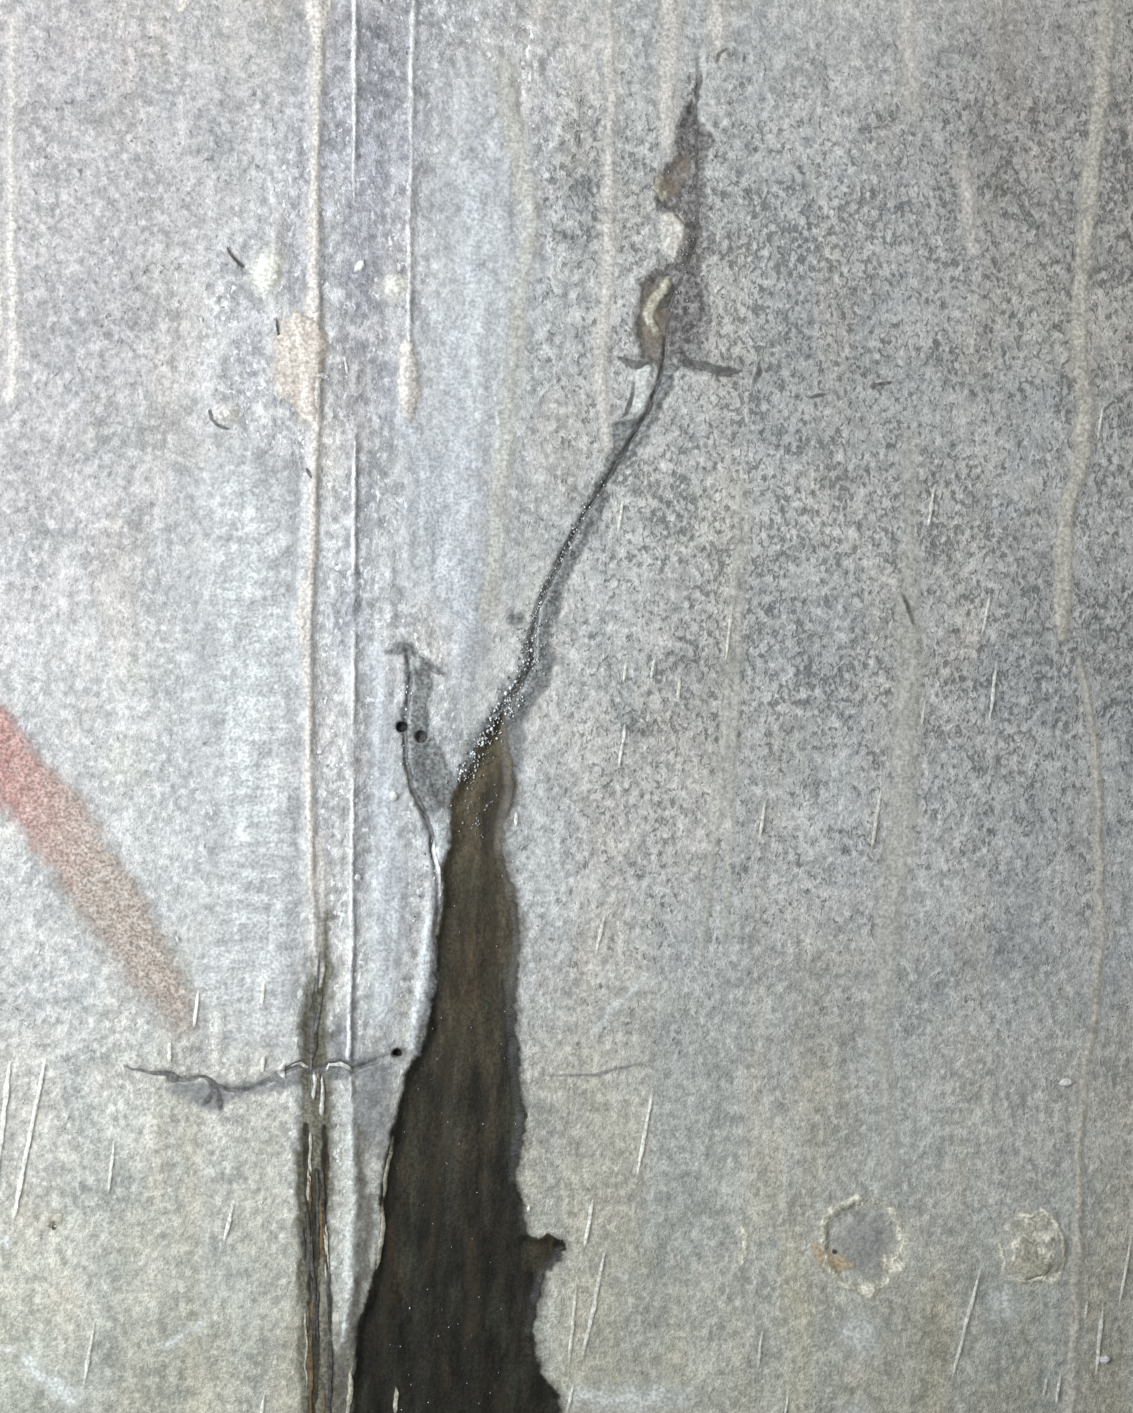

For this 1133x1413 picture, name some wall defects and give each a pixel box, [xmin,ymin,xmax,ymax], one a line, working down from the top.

damp [272,0,565,1413]
crack [125,48,760,1115]